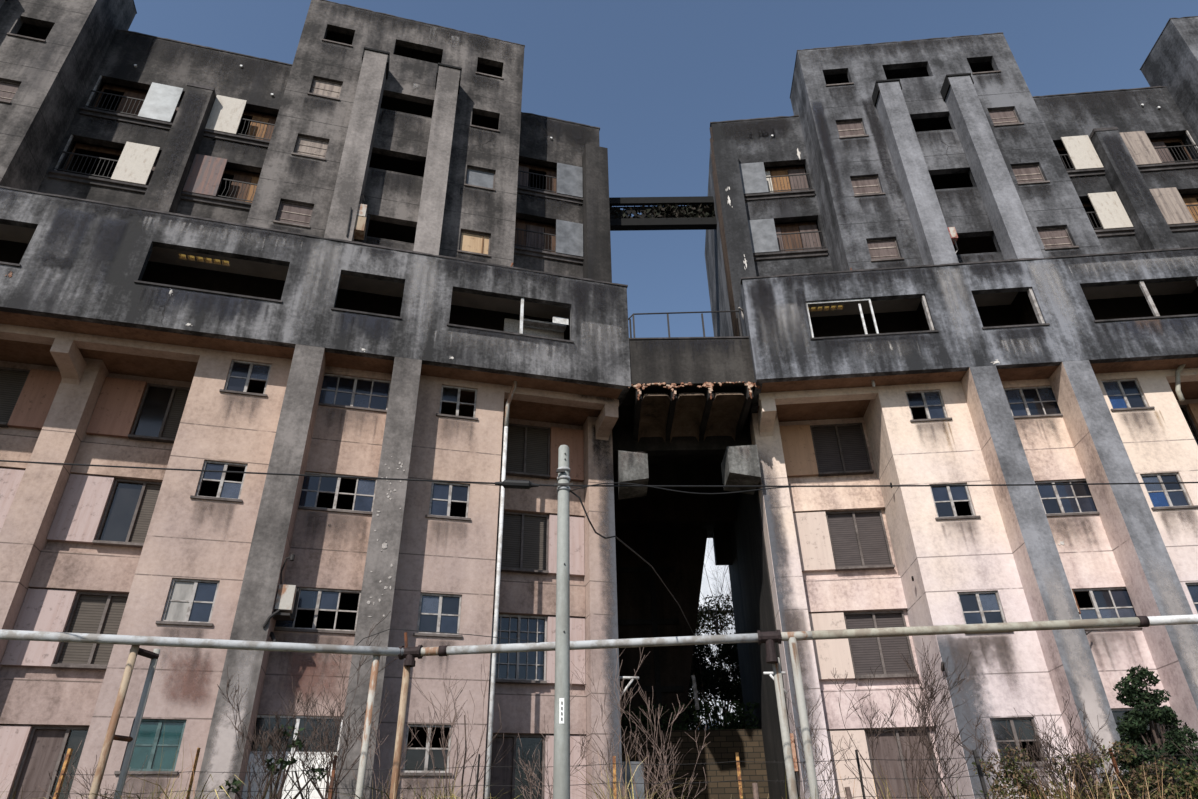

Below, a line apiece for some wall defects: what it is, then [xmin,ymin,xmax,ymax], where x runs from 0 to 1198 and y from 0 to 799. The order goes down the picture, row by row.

leakage [1104,136,1197,191]
leakage [49,201,302,249]
leakage [1132,250,1198,261]
leakage [750,261,905,319]
spalling [628,381,761,401]
leakage [760,468,813,795]
leakage [936,637,995,799]